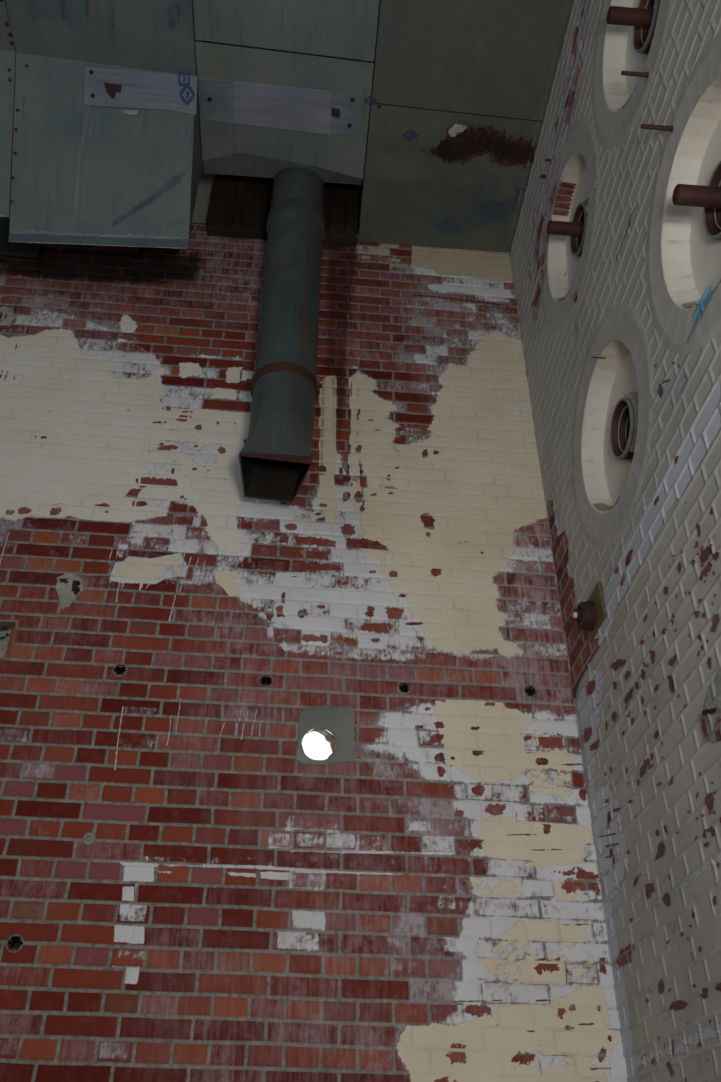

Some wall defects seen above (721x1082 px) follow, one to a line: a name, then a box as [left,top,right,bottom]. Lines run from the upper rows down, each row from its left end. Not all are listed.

corrosion [417,122,538,171]
peeling [0,243,721,1082]